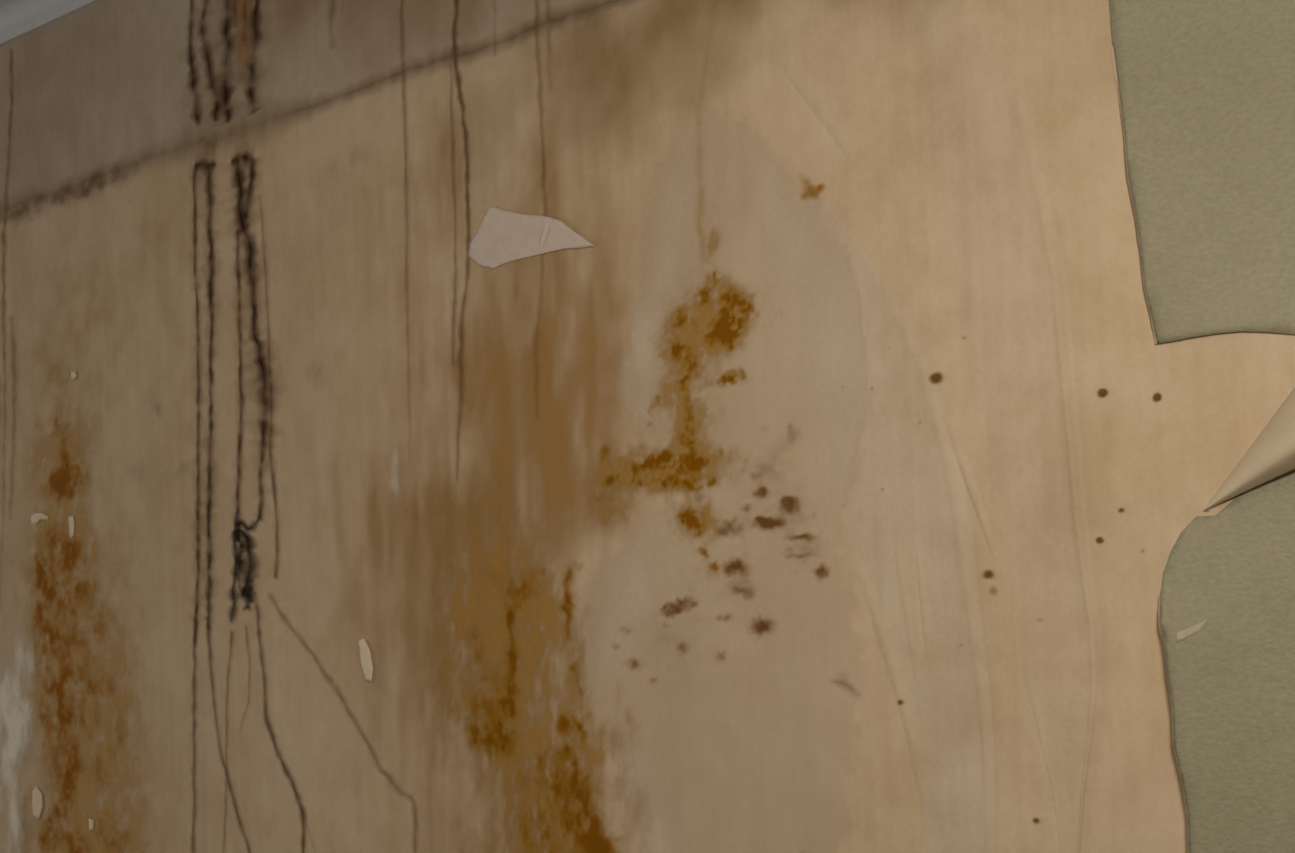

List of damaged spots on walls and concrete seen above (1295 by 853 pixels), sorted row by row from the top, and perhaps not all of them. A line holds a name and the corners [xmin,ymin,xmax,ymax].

peeling [0,637,35,853]
corrosion [27,407,145,853]
damp [193,163,215,432]
damp [189,2,230,121]
damp [230,154,276,621]
peeling [358,639,373,682]
damp [453,0,469,243]
damp [407,250,619,612]
corrosion [434,506,616,853]
peeling [468,207,594,268]
corrosion [596,272,754,523]
corrosion [678,504,718,571]